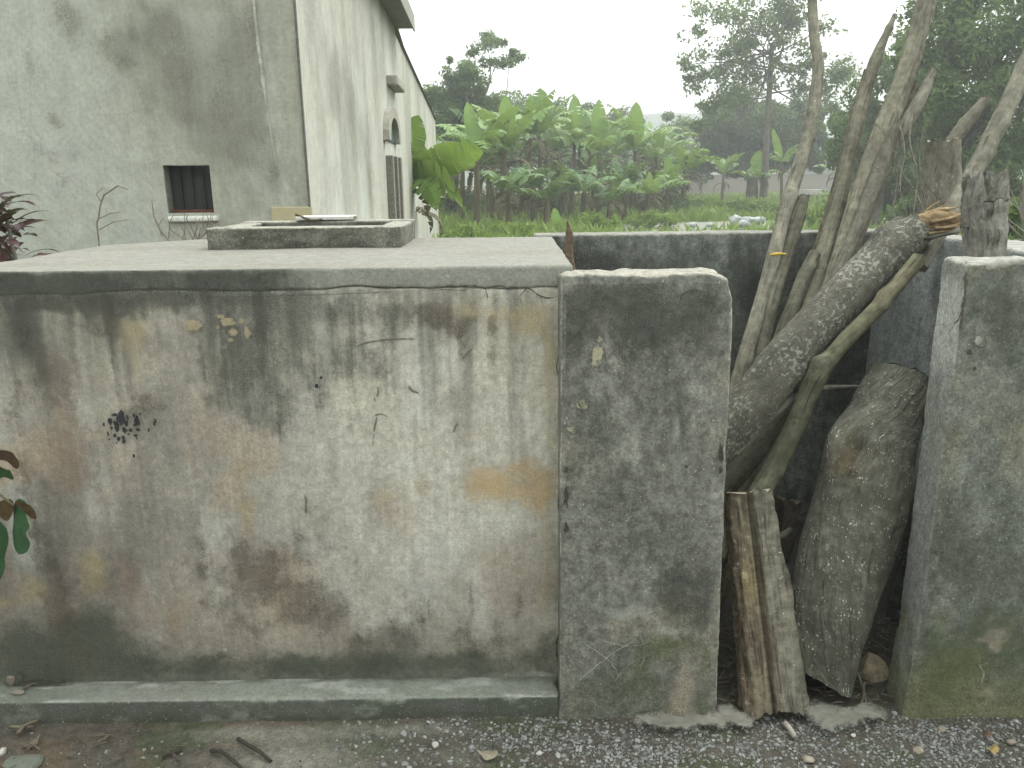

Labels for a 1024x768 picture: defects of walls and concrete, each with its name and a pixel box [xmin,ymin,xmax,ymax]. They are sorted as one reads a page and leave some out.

crack [25,285,605,325]
peeling [184,314,251,342]
damp [378,297,553,367]
spalling [591,336,606,368]
damp [0,521,558,687]